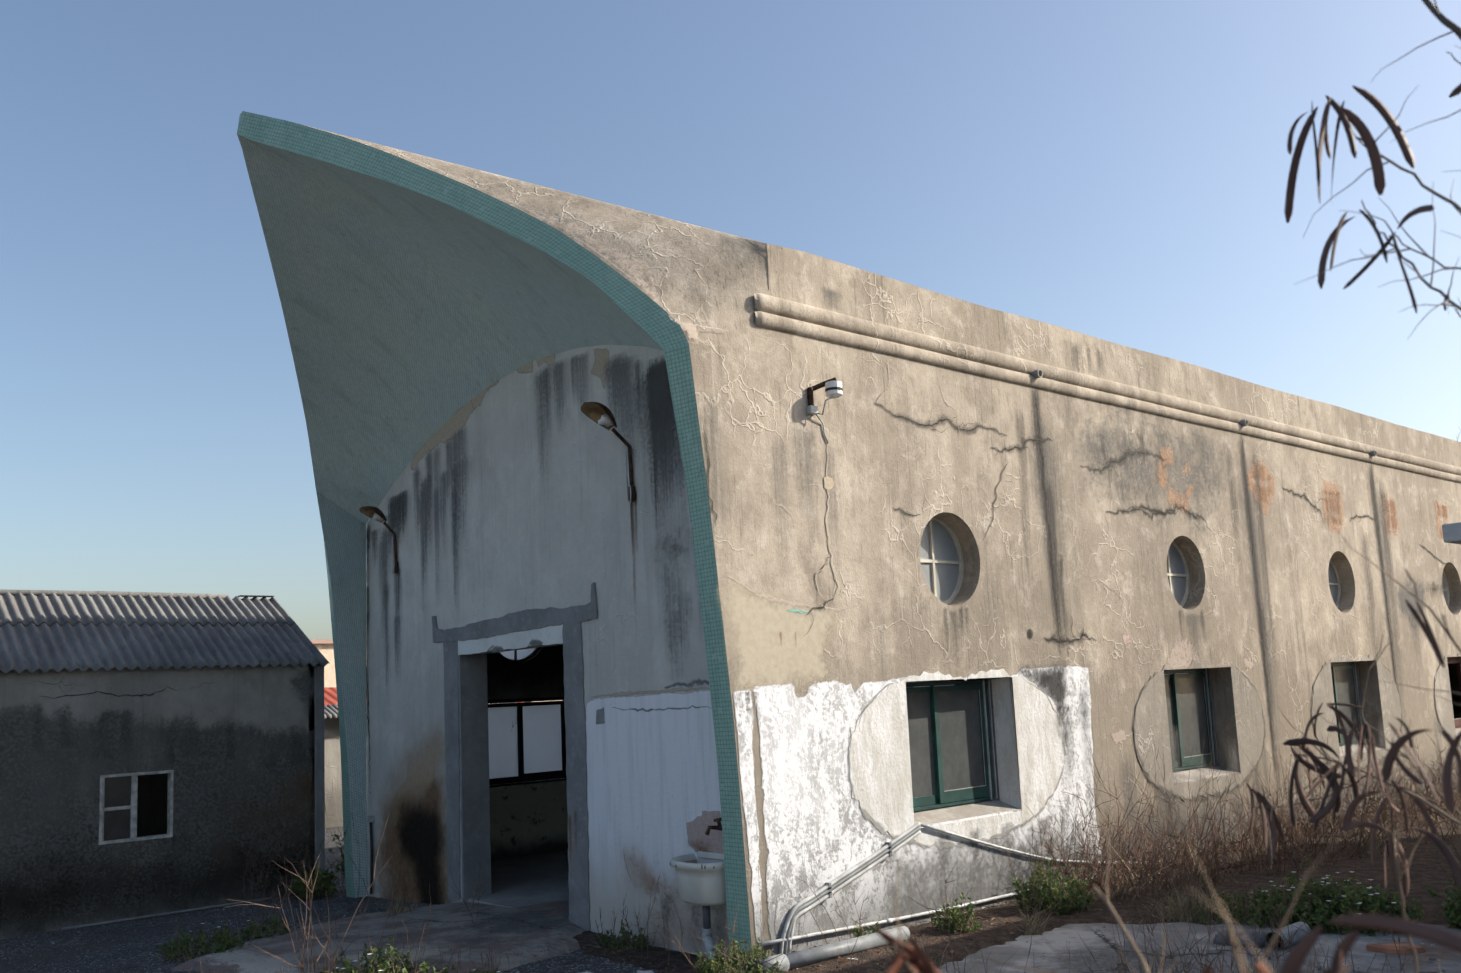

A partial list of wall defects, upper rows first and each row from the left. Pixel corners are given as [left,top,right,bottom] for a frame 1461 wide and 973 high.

damp [614,360,676,465]
crack [775,444,858,635]
crack [875,361,1053,537]
damp [1024,392,1086,742]
crack [1080,442,1203,533]
damp [0,706,315,930]
peeling [726,575,1102,955]